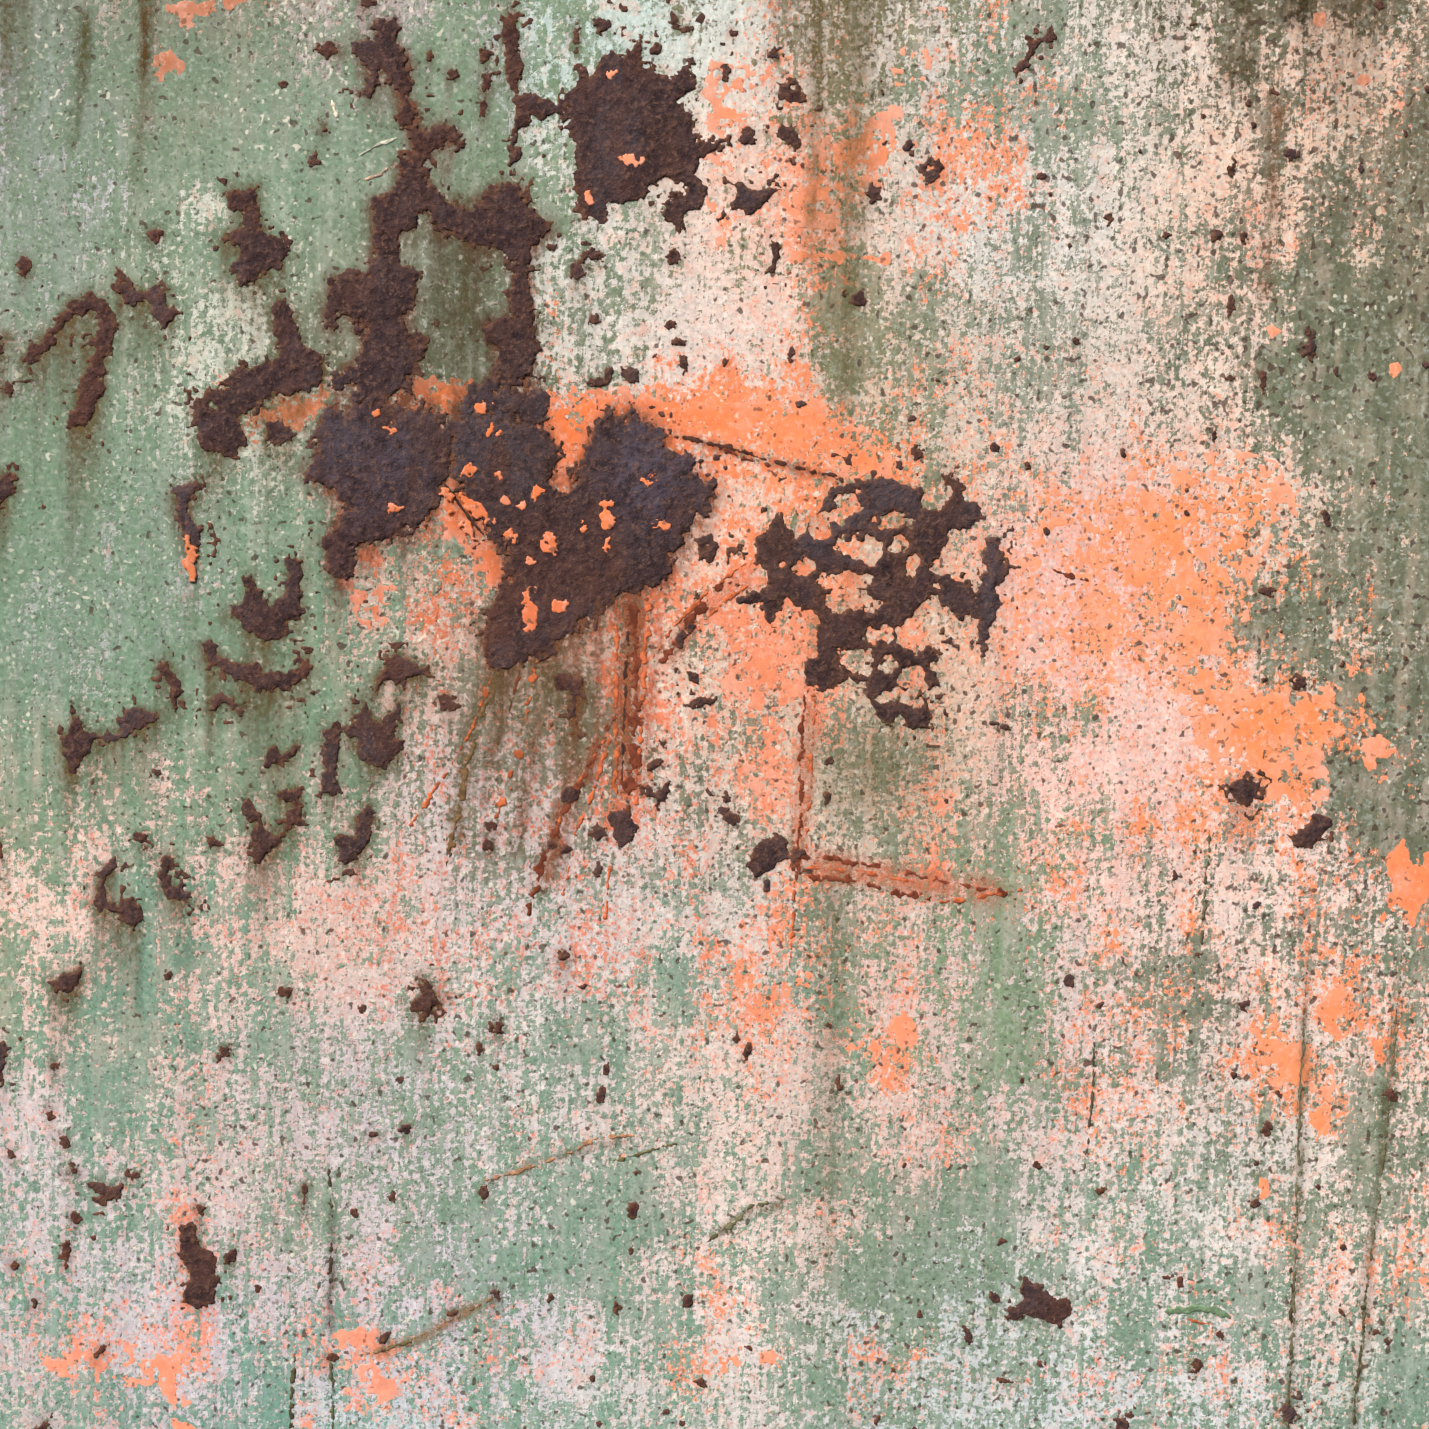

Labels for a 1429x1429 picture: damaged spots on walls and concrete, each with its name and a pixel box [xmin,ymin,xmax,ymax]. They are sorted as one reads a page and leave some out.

rust [15,256,32,279]
rust [0,267,191,457]
rust [42,0,1021,892]
peeling [1016,445,1372,829]
peeling [1354,692,1397,783]
rust [83,831,209,940]
peeling [1379,839,1429,928]
peeling [1248,984,1348,1142]
peeling [1373,1040,1387,1064]
rust [166,1204,237,1310]
rust [989,1269,1073,1329]
peeling [33,1343,198,1429]